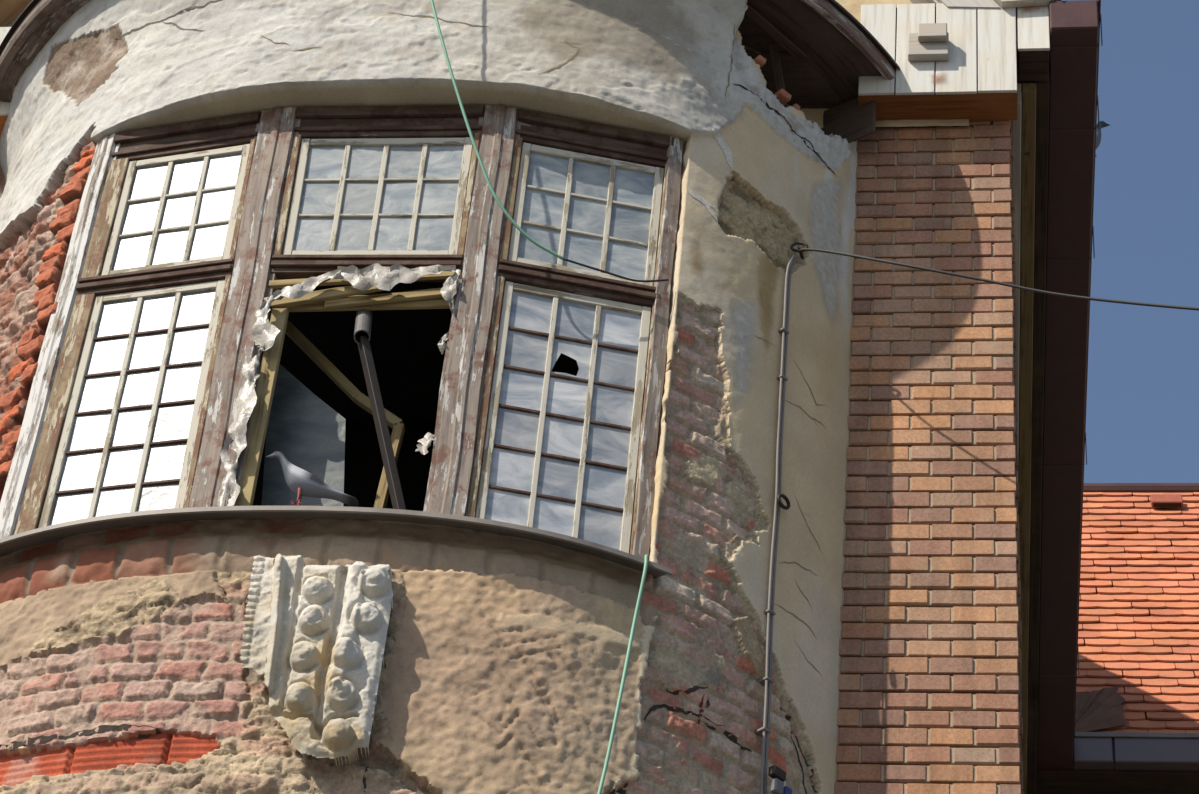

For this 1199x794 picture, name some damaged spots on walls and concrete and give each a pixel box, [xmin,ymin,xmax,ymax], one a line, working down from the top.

peeling [44,23,129,106]
crack [113,0,221,39]
crack [261,35,323,51]
crack [389,12,485,27]
crack [539,40,581,74]
spalling [741,3,806,110]
spalling [718,171,812,274]
spalling [0,122,99,502]
spalling [609,292,822,794]
crack [776,496,822,676]
spalling [0,569,417,794]
crack [780,707,818,794]